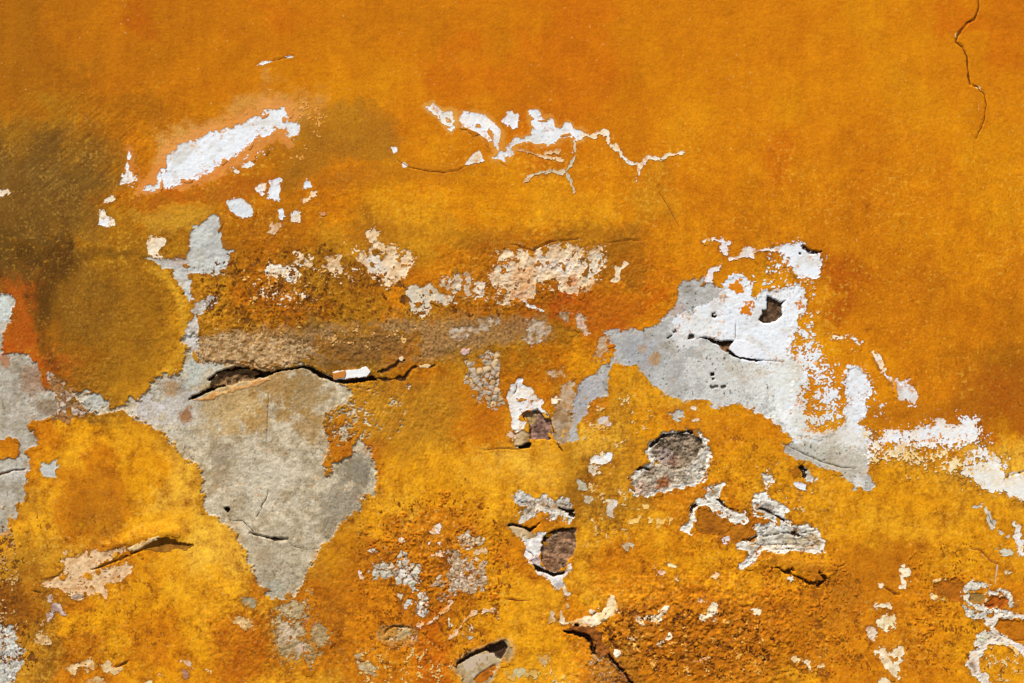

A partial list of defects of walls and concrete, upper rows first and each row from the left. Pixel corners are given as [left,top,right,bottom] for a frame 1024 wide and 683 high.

crack [955,0,987,138]
peeling [120,95,337,197]
peeling [391,103,685,193]
peeling [255,177,317,235]
crack [189,356,436,401]
flaking render [0,195,1024,683]